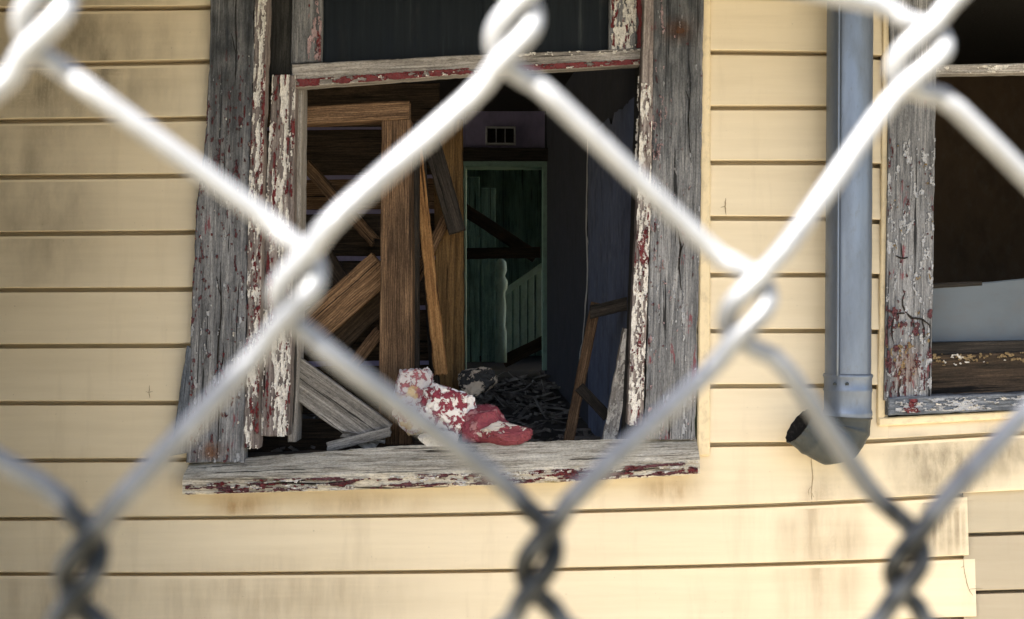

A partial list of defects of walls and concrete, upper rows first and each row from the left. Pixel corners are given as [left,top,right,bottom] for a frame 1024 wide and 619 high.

peeling [205,0,481,225]
peeling [188,184,290,406]
peeling [603,195,686,439]
crack [886,293,931,347]
peeling [884,138,1024,413]
peeling [193,336,292,463]
peeling [185,473,488,495]
peeling [508,468,587,483]
peeling [608,461,698,479]